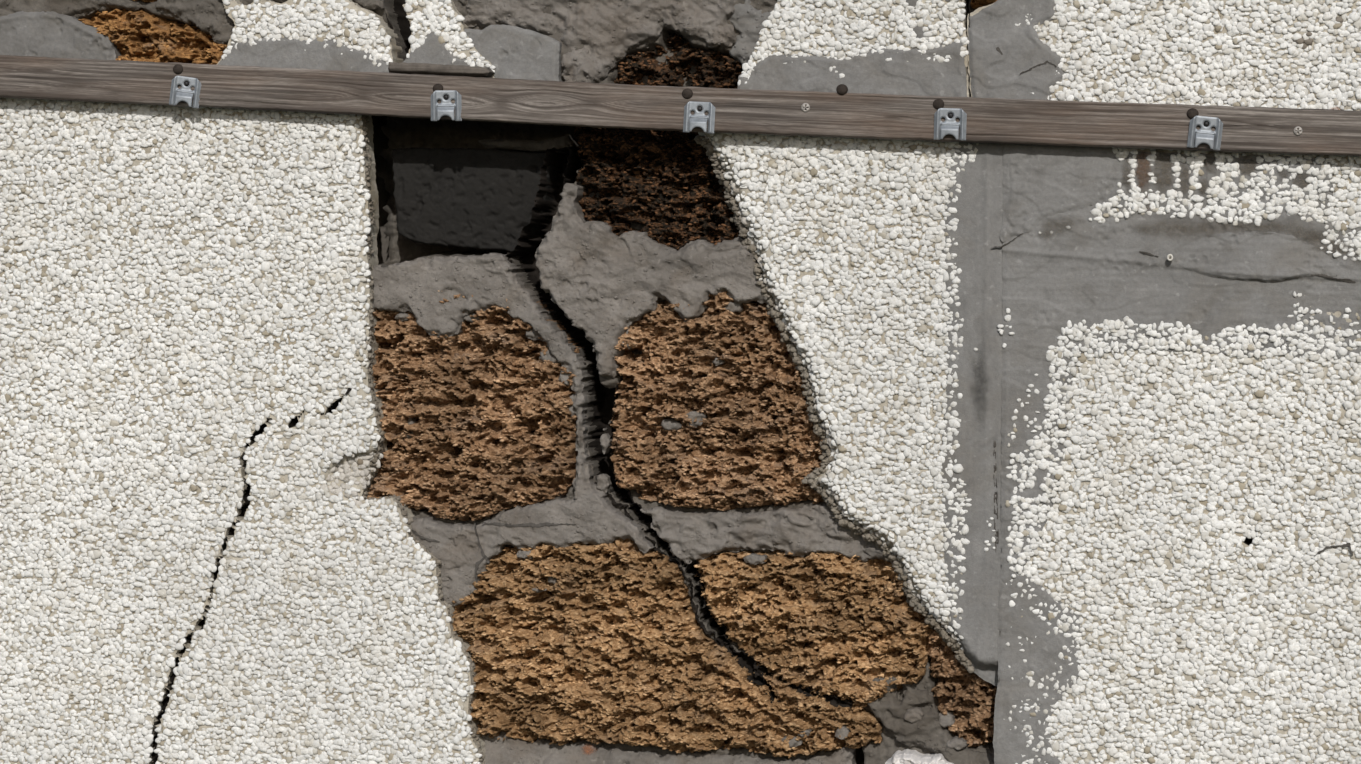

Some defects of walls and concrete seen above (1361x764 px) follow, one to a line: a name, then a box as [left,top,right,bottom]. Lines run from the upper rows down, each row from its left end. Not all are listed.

spalling [0,0,1067,100]
crack [151,388,352,764]
crack [411,530,440,542]
crack [474,522,576,583]
crack [505,147,852,708]
spalling [320,115,1361,764]